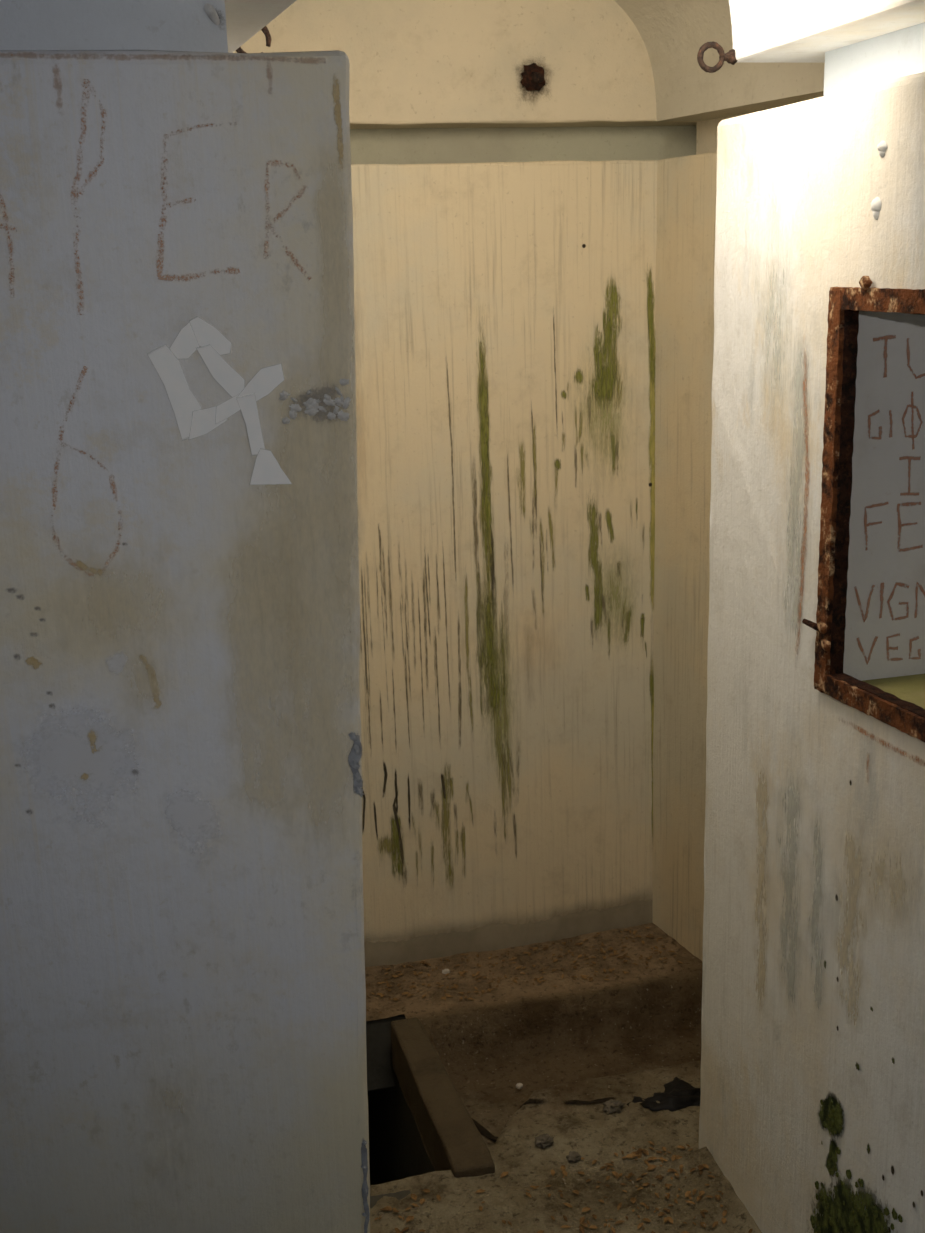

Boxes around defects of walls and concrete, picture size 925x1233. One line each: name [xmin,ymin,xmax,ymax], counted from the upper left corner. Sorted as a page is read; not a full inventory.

damp [647,269,655,383]
spalling [279,378,351,424]
damp [507,411,554,583]
damp [606,511,614,541]
damp [360,369,511,798]
damp [624,610,644,641]
damp [362,762,410,876]
damp [441,771,466,884]